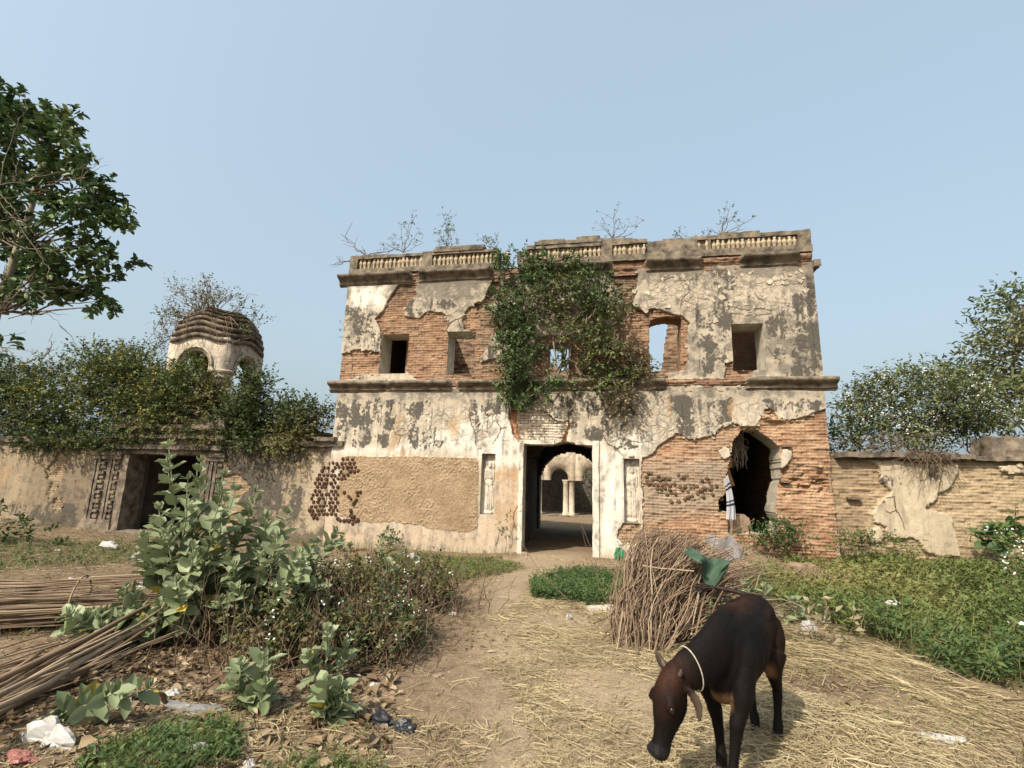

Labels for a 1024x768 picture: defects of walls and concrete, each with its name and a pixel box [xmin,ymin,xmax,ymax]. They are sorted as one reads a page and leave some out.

spalling [340,276,508,380]
spalling [532,268,809,379]
water stain [692,267,742,377]
water stain [765,274,822,376]
water stain [336,398,443,450]
water stain [470,399,503,427]
spalling [518,411,570,441]
water stain [668,394,733,436]
water stain [763,396,821,416]
spalling [618,408,839,562]